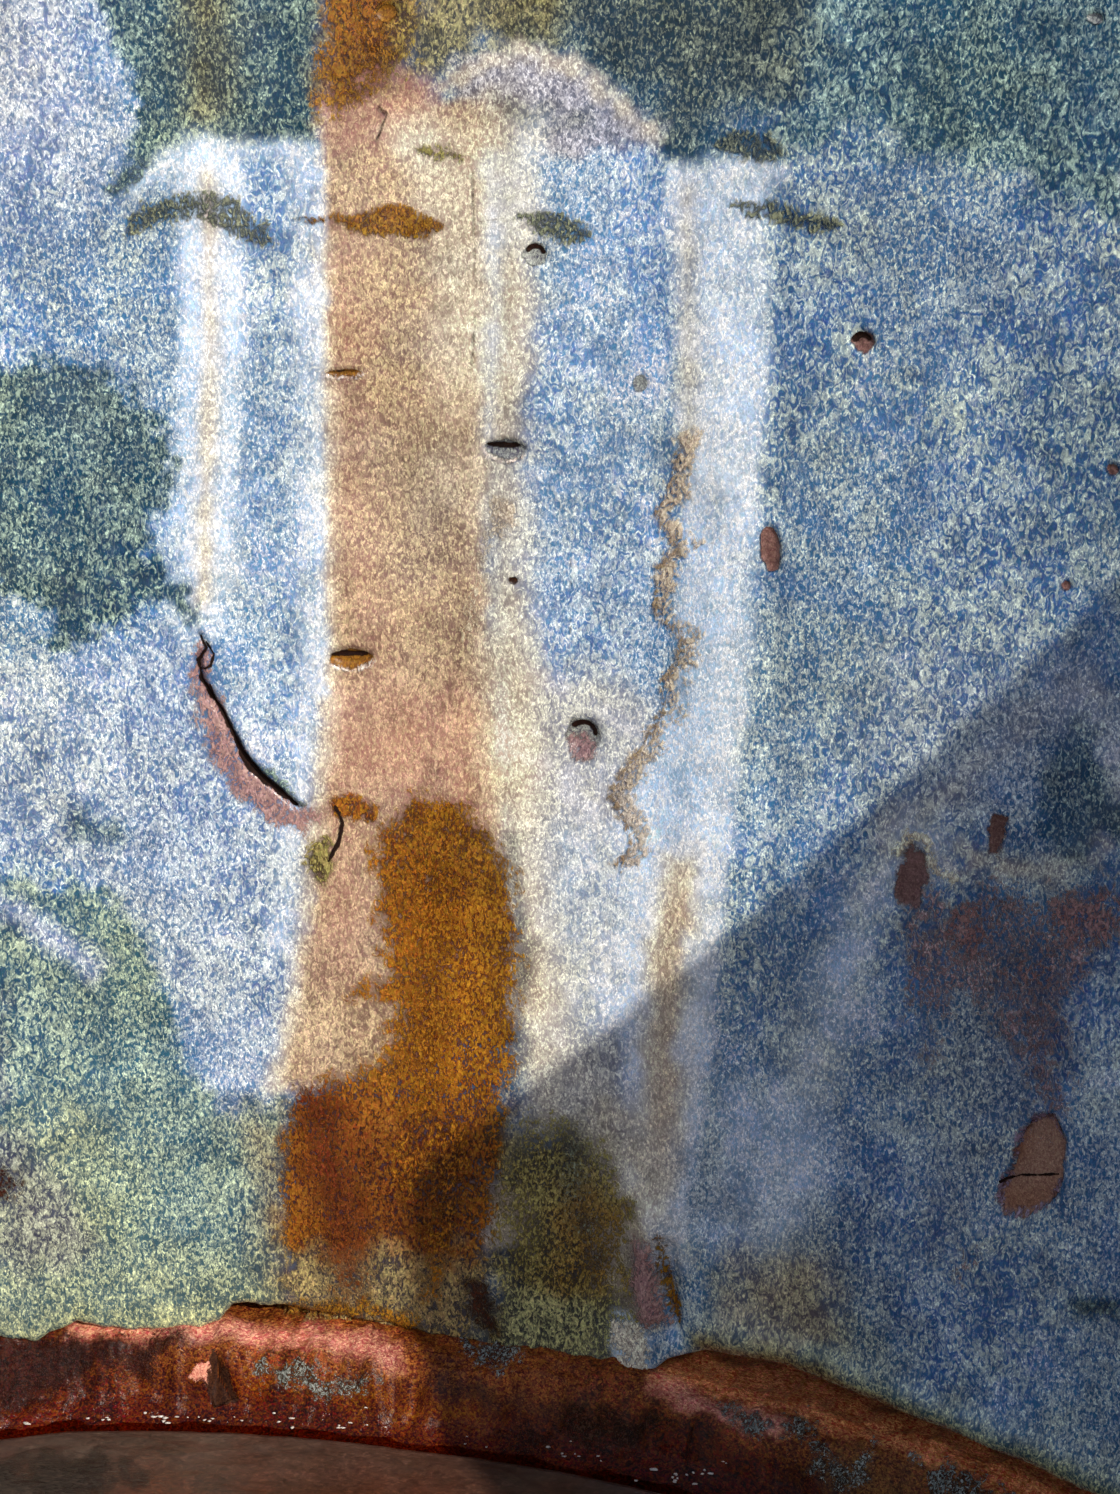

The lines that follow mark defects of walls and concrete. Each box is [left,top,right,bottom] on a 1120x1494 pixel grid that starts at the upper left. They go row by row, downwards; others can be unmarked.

rust [309,0,423,121]
spalling [761,526,780,571]
crack [188,634,344,862]
spalling [891,828,959,909]
rust [272,788,530,1340]
spalling [995,1111,1066,1219]